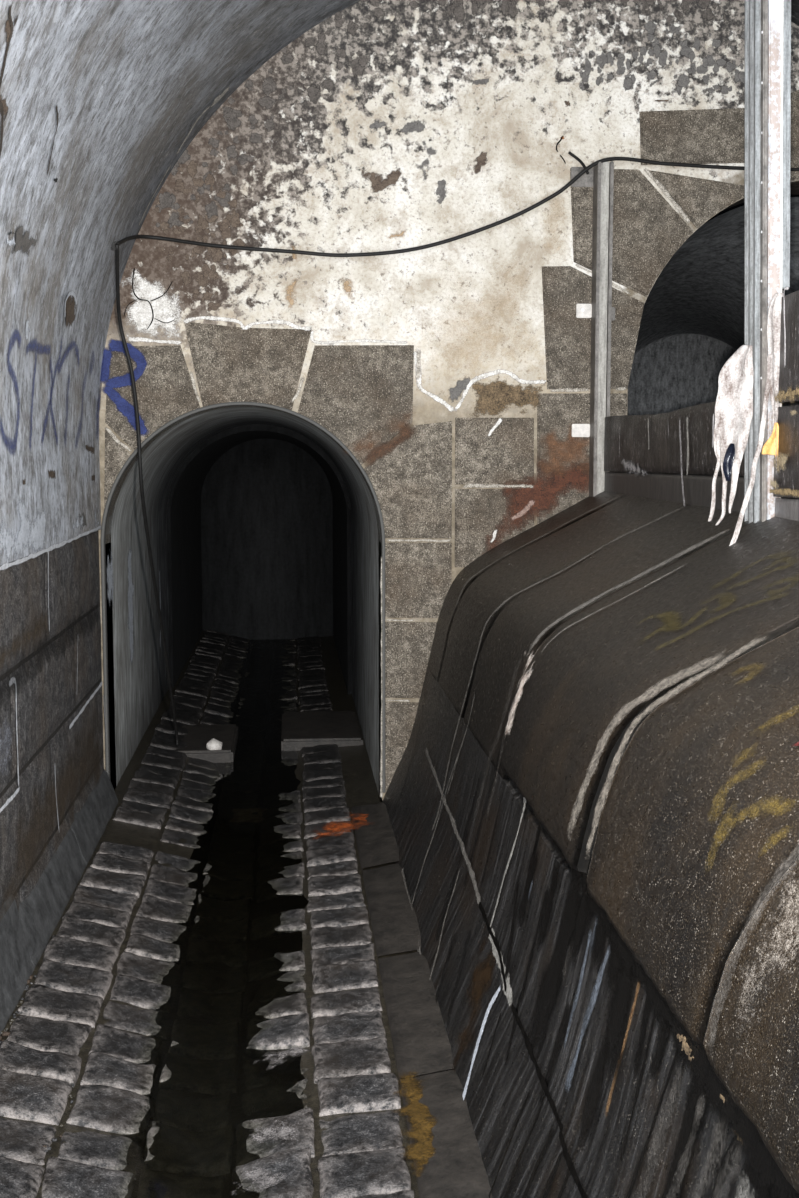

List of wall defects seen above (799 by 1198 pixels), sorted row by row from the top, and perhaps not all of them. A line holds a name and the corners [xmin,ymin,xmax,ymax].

flaking render [536,0,595,8]
flaking render [579,0,745,102]
flaking render [139,0,546,417]
corrosion [365,425,414,464]
corrosion [488,433,589,548]